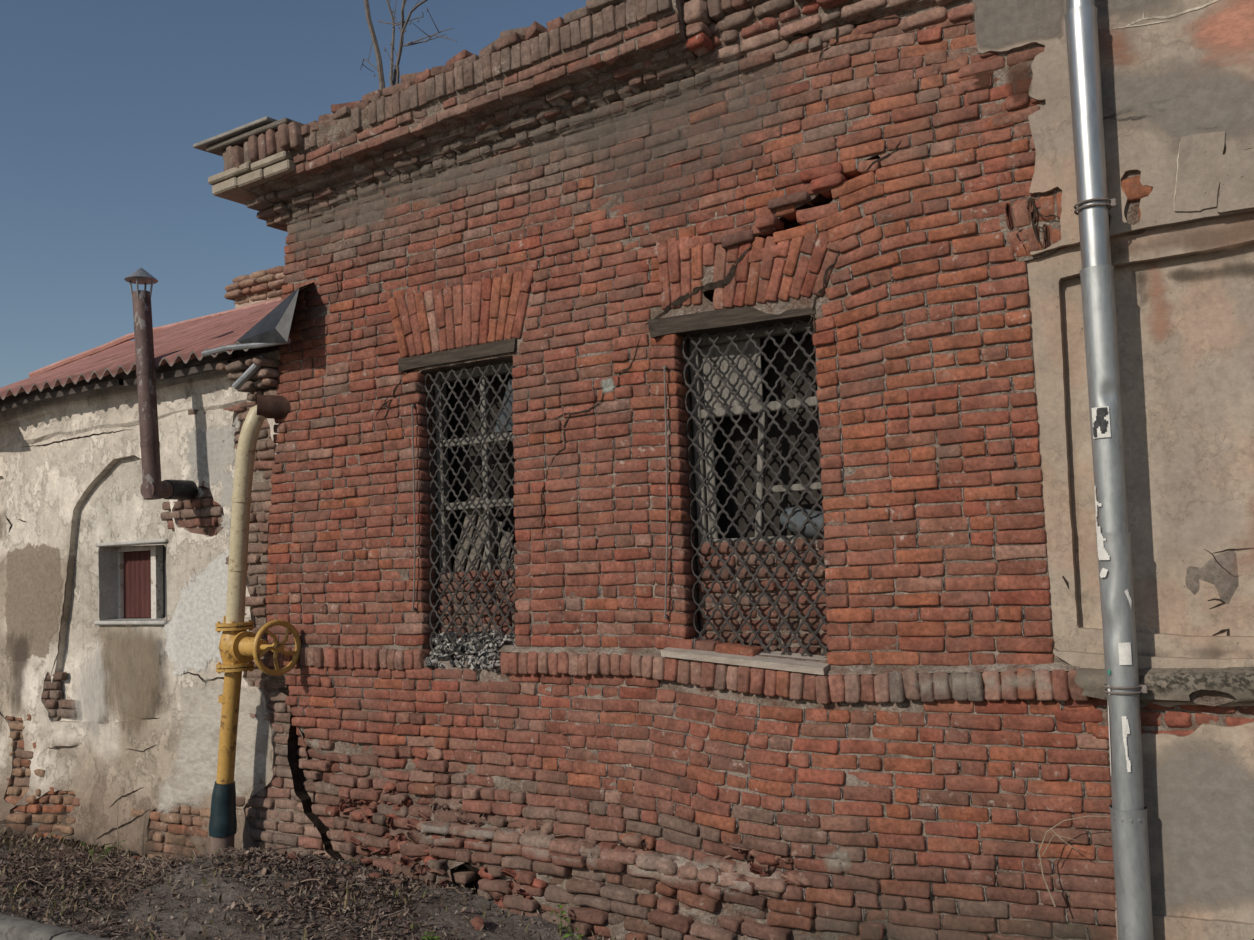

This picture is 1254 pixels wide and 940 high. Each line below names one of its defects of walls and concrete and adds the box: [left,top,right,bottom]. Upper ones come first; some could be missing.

crack [863,141,901,173]
flaking render [931,44,1067,262]
crack [808,252,840,342]
crack [540,194,833,532]
peeling [160,393,256,680]
crack [1205,548,1254,636]
damp [12,638,28,707]
flaking render [0,714,80,839]
flaking render [42,672,80,721]
crack [278,685,355,861]
flaking render [236,419,599,908]
flaking render [1140,689,1254,736]